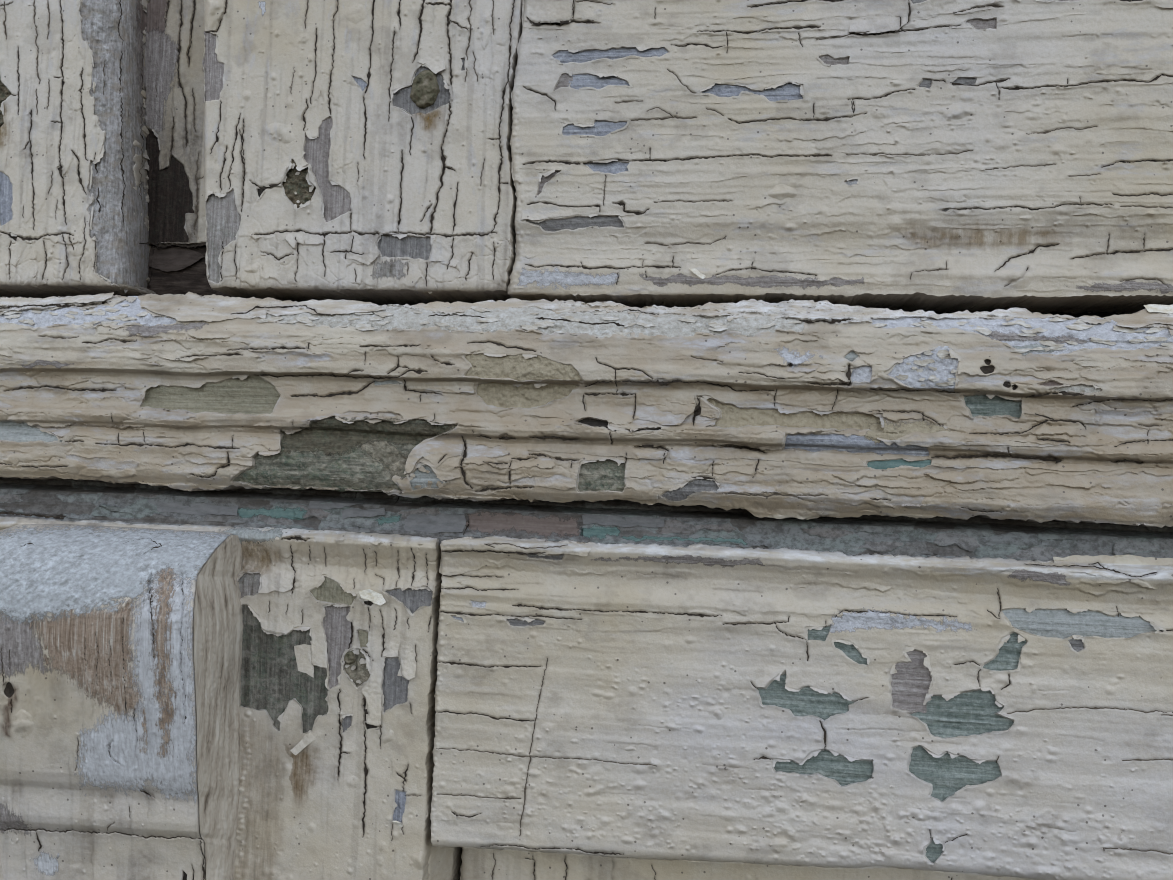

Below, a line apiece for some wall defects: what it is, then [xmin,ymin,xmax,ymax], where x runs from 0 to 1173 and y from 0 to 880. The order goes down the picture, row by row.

peeling [816,55,849,66]
peeling [0,0,805,338]
crack [0,0,1173,326]
peeling [639,268,864,289]
peeling [868,281,1173,355]
crack [176,314,536,425]
crack [0,386,240,478]
peeling [0,346,1173,802]
crack [337,689,404,841]
crack [397,765,521,818]
crack [482,844,622,880]
peeling [924,837,945,863]